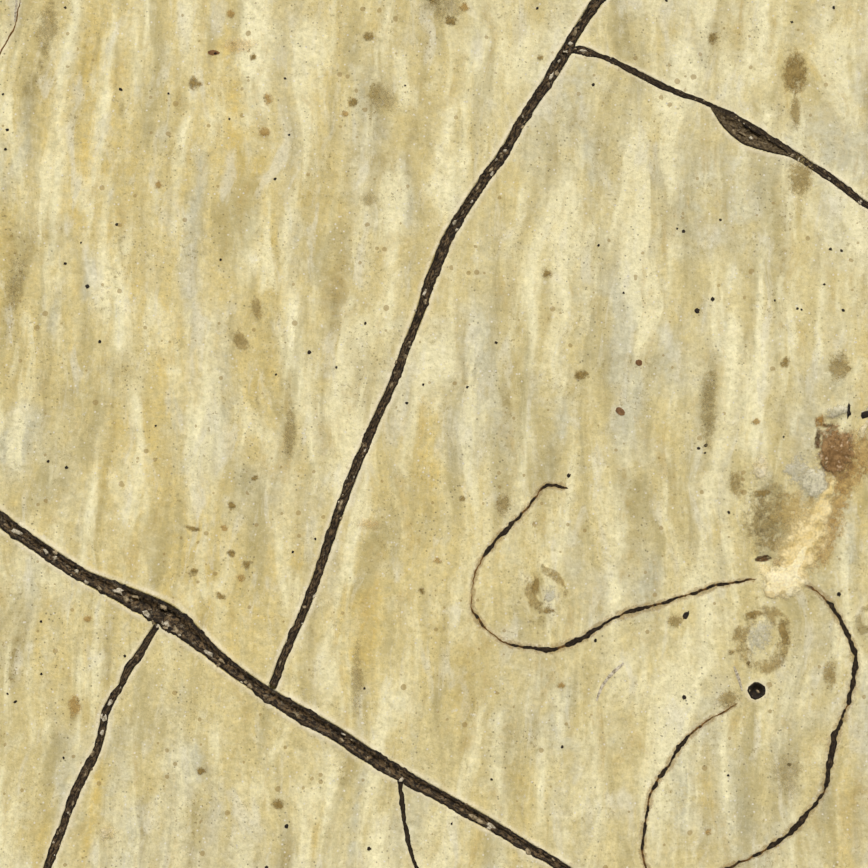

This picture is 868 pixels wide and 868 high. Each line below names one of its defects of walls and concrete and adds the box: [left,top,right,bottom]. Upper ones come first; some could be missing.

crack [0,3,20,55]
crack [269,0,868,687]
damp [731,474,742,494]
crack [0,511,571,868]
crack [640,704,737,868]
crack [724,583,859,868]